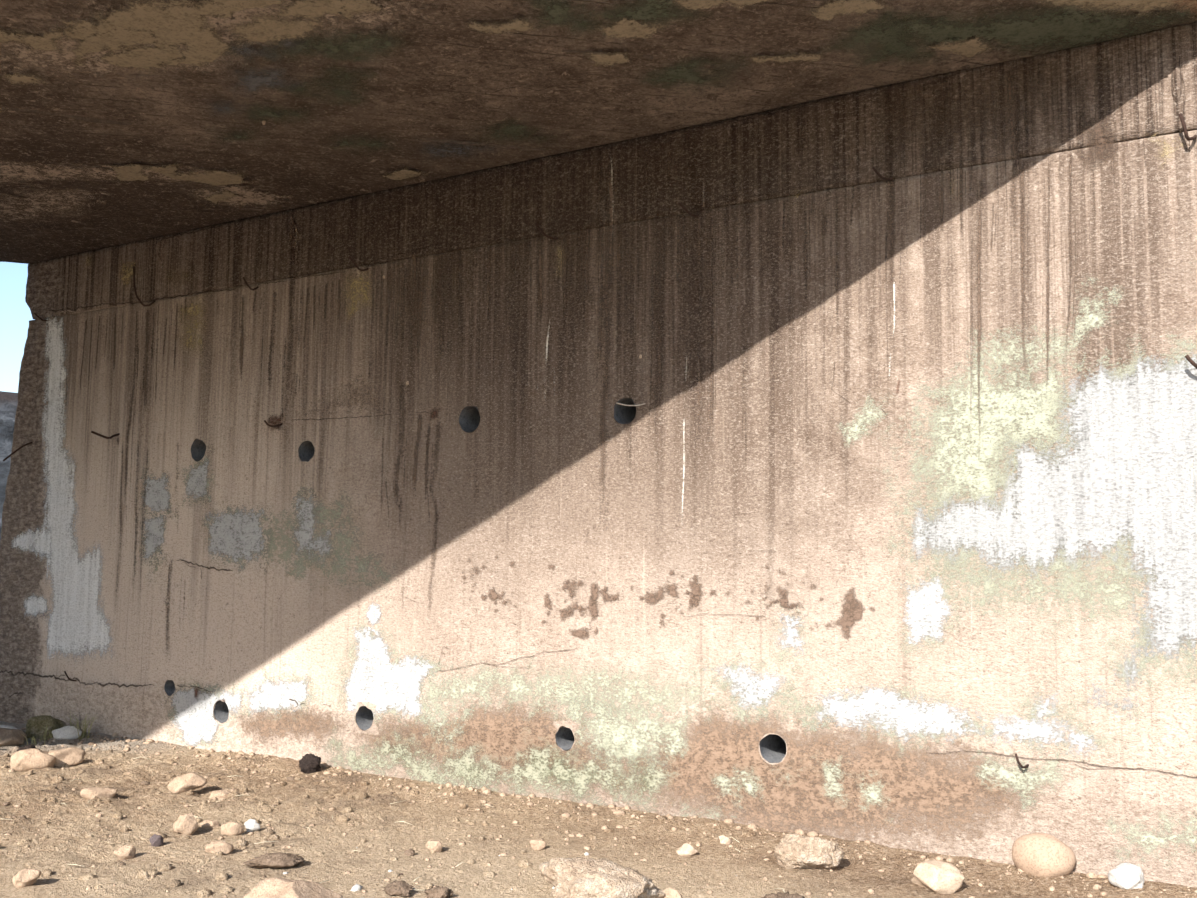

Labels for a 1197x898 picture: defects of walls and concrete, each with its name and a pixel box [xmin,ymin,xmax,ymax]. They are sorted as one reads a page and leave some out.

water stain [885,56,1118,430]
water stain [66,300,218,588]
peeling [141,449,272,568]
peeling [294,489,333,559]
water stain [382,385,441,600]
water stain [481,588,515,612]
water stain [542,570,729,638]
water stain [748,566,800,620]
water stain [816,588,875,638]
peeling [339,624,443,726]
water stain [361,698,1037,845]
crack [930,750,1197,778]